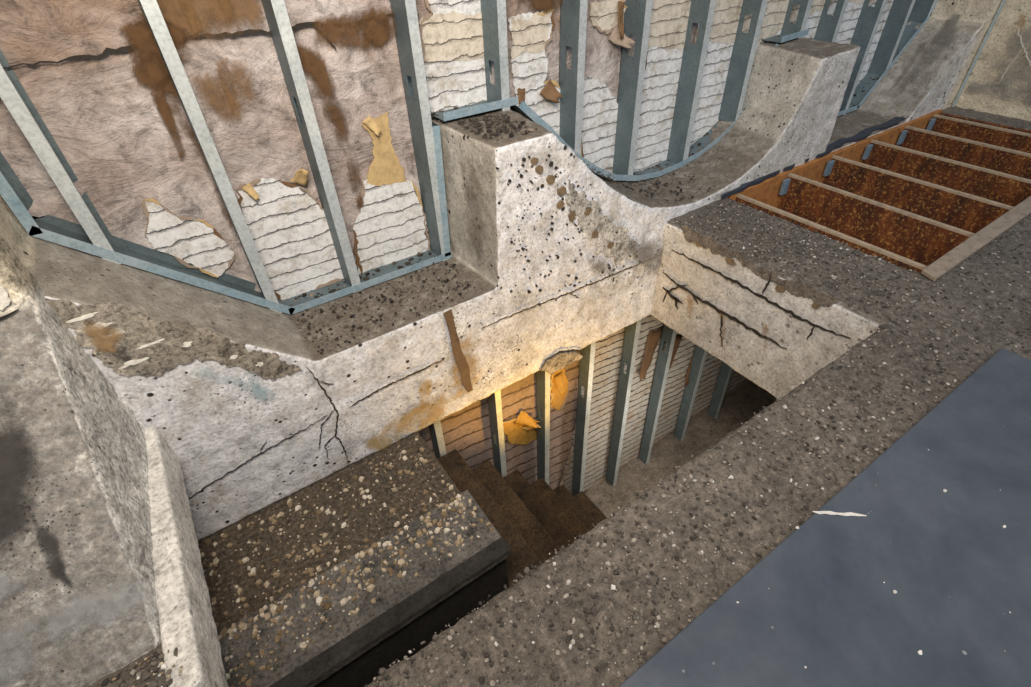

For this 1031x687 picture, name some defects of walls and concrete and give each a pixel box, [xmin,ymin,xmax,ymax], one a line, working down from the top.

damp [121,12,209,170]
damp [156,0,262,61]
damp [296,8,397,139]
peeling [419,0,491,119]
peeling [634,0,894,172]
peeling [141,198,235,278]
peeling [236,169,344,300]
peeling [353,178,430,274]
crack [481,263,640,329]
crack [662,249,851,349]
crack [188,359,444,499]
damp [37,527,71,585]